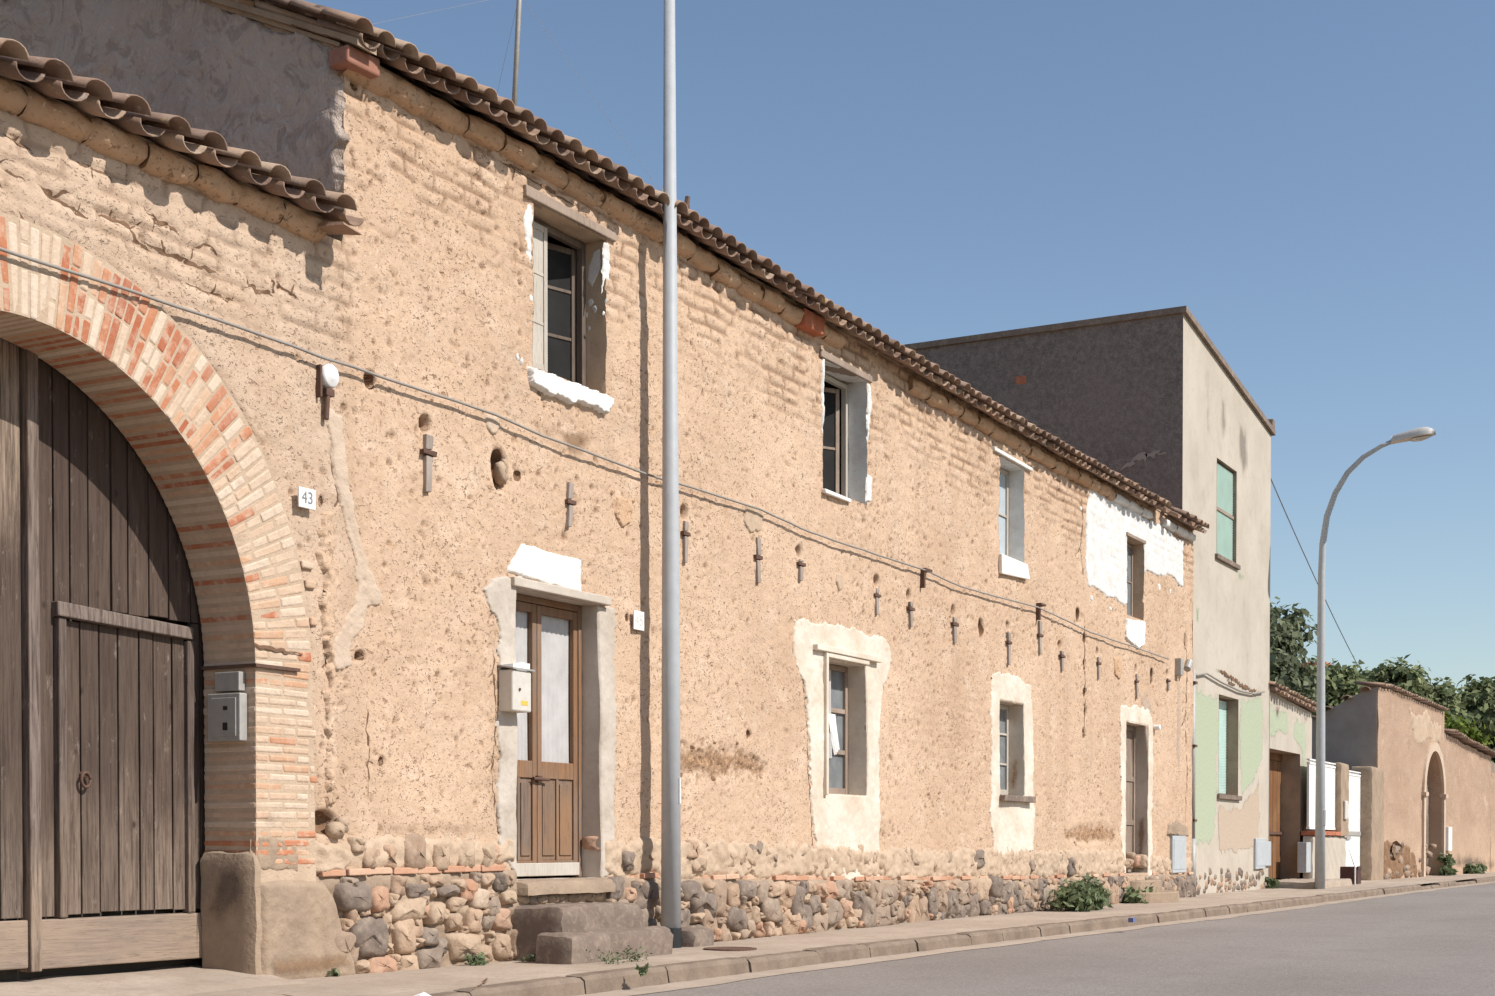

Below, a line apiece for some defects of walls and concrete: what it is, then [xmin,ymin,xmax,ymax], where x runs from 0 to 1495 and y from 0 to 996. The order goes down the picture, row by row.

crack [0,134,297,302]
peeling [1076,489,1184,621]
spalling [680,730,763,781]